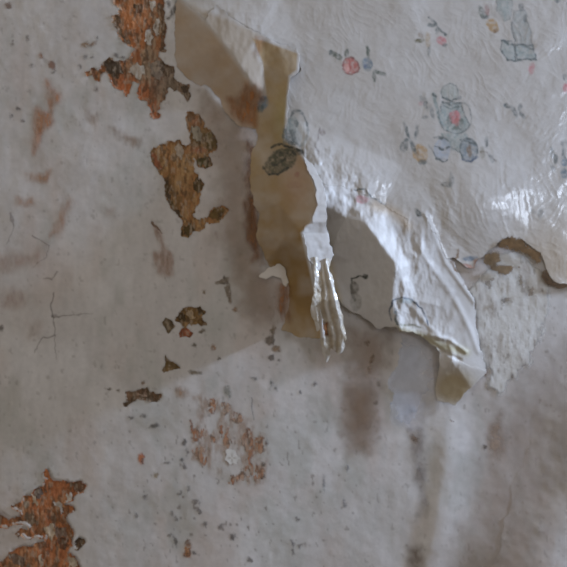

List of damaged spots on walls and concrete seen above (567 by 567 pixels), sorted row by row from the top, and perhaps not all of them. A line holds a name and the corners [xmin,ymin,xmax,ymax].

flaking render [80,0,191,119]
flaking render [150,111,229,238]
flaking render [162,306,207,338]
flaking render [266,328,280,361]
flaking render [117,382,162,407]
flaking render [0,469,86,567]